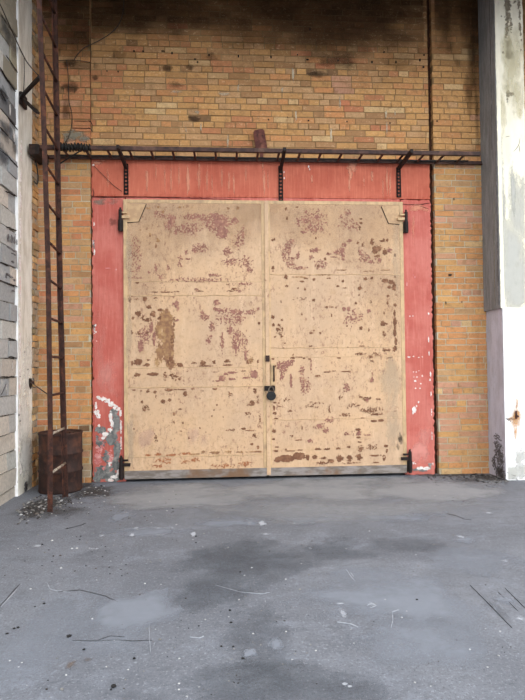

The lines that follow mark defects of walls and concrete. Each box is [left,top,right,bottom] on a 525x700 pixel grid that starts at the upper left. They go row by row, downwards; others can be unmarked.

leakage [57,0,224,45]
leakage [239,0,423,48]
leakage [434,0,479,86]
peeling [127,206,260,412]
peeling [282,207,398,362]
peeling [271,354,350,395]
peeling [93,396,122,482]
peeling [226,388,261,449]
peeling [272,428,388,464]
peeling [306,396,384,434]